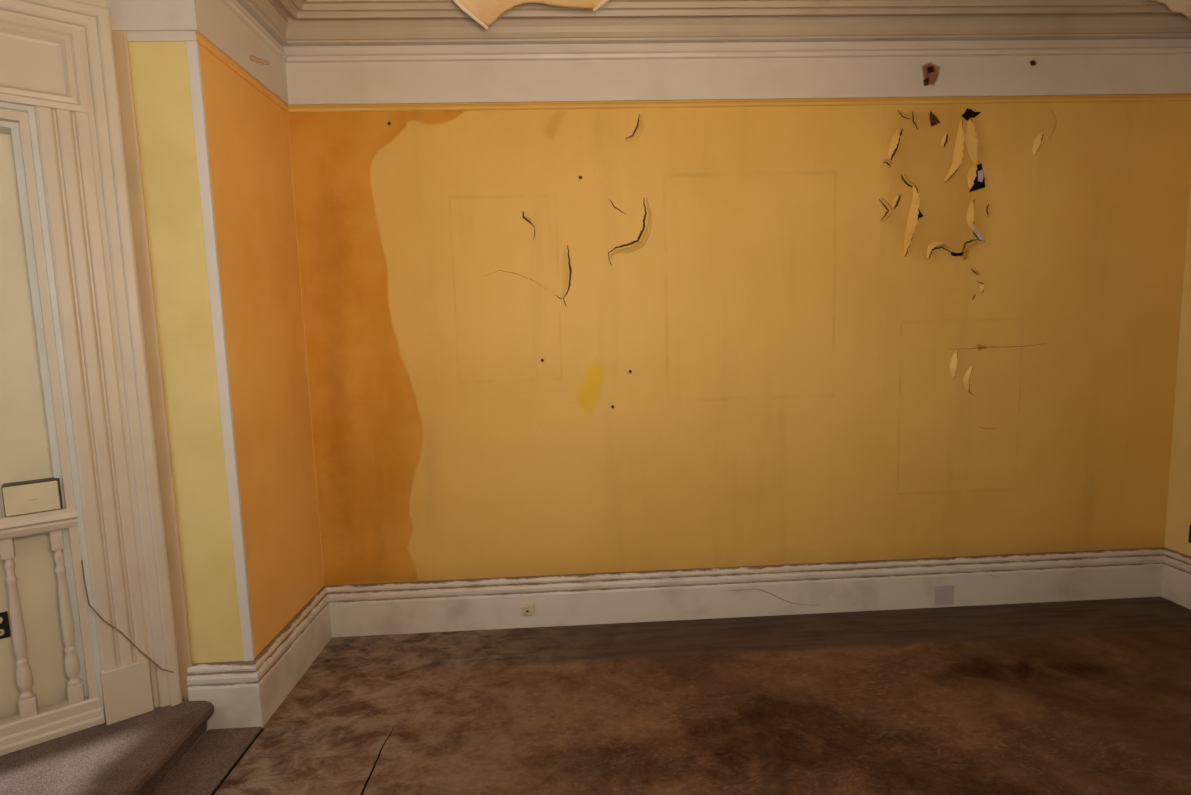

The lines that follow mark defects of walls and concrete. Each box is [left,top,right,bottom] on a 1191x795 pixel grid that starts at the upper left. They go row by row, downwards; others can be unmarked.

peeling [879,108,991,258]